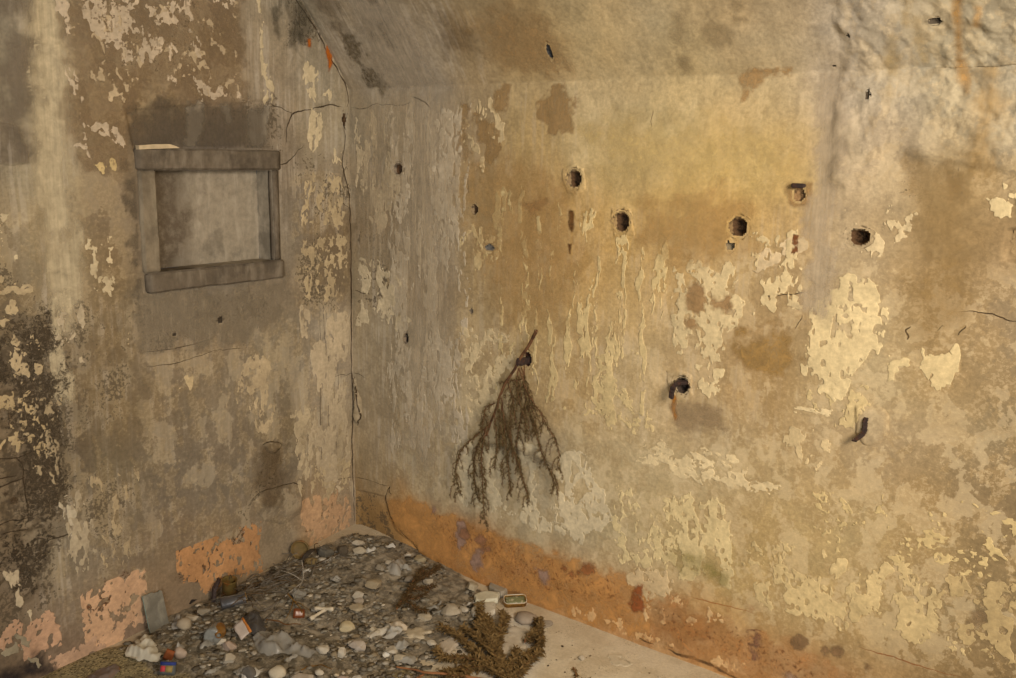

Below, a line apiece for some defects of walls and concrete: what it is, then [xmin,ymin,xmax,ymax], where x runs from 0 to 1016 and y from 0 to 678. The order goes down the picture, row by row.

peeling [53,0,242,174]
peeling [256,0,275,105]
peeling [302,61,332,152]
peeling [0,275,62,484]
peeling [52,304,86,347]
crack [270,1,431,550]
peeling [290,84,1016,665]
peeling [0,473,147,671]
peeling [176,523,263,595]
water stain [455,521,491,572]
water stain [562,563,595,577]
water stain [791,634,808,650]